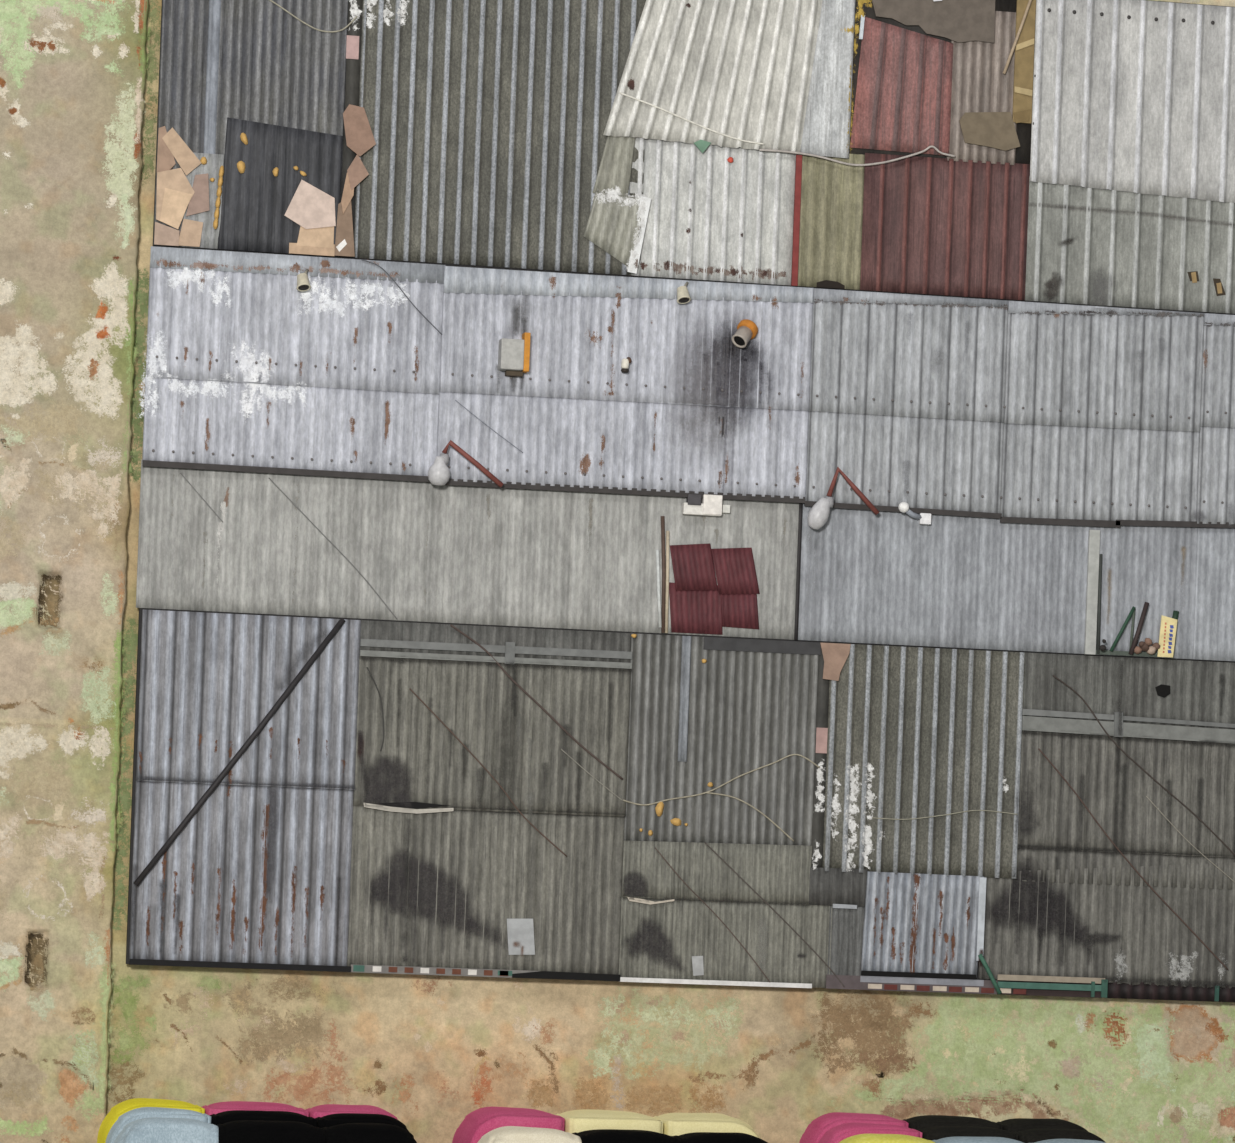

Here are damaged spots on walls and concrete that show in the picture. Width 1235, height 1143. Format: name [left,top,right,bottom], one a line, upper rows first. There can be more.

peeling [0,0,147,517]
peeling [161,267,231,309]
peeling [297,276,410,318]
peeling [138,330,312,418]
flaking render [50,461,123,551]
peeling [0,940,64,1022]
peeling [1114,949,1129,980]
peeling [1165,951,1198,982]
flaking render [0,1020,106,1143]
peeling [825,992,1235,1143]